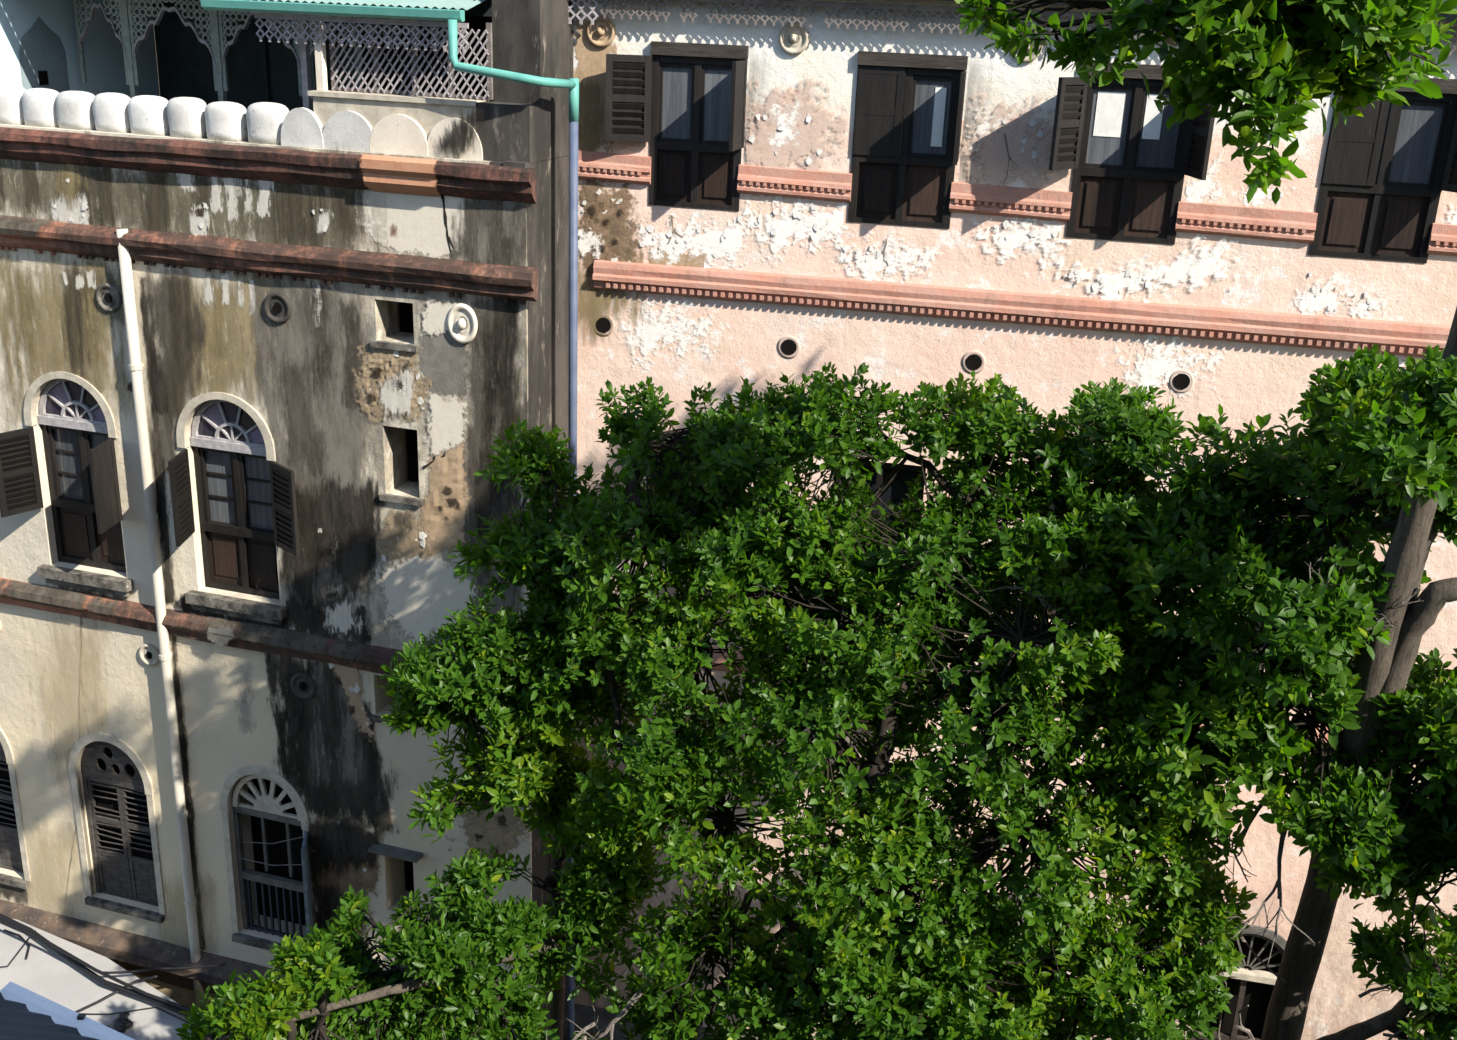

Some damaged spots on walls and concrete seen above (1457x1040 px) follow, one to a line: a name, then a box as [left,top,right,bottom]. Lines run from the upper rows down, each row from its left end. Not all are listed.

peeling [746,75,848,171]
damp [0,158,365,250]
flaking render [578,180,938,284]
peeling [972,217,1240,303]
damp [10,272,36,366]
flaking render [352,340,433,428]
flaking render [376,441,471,566]
damp [459,294,535,626]
damp [61,262,398,950]
damp [0,578,127,765]
damp [446,777,532,870]